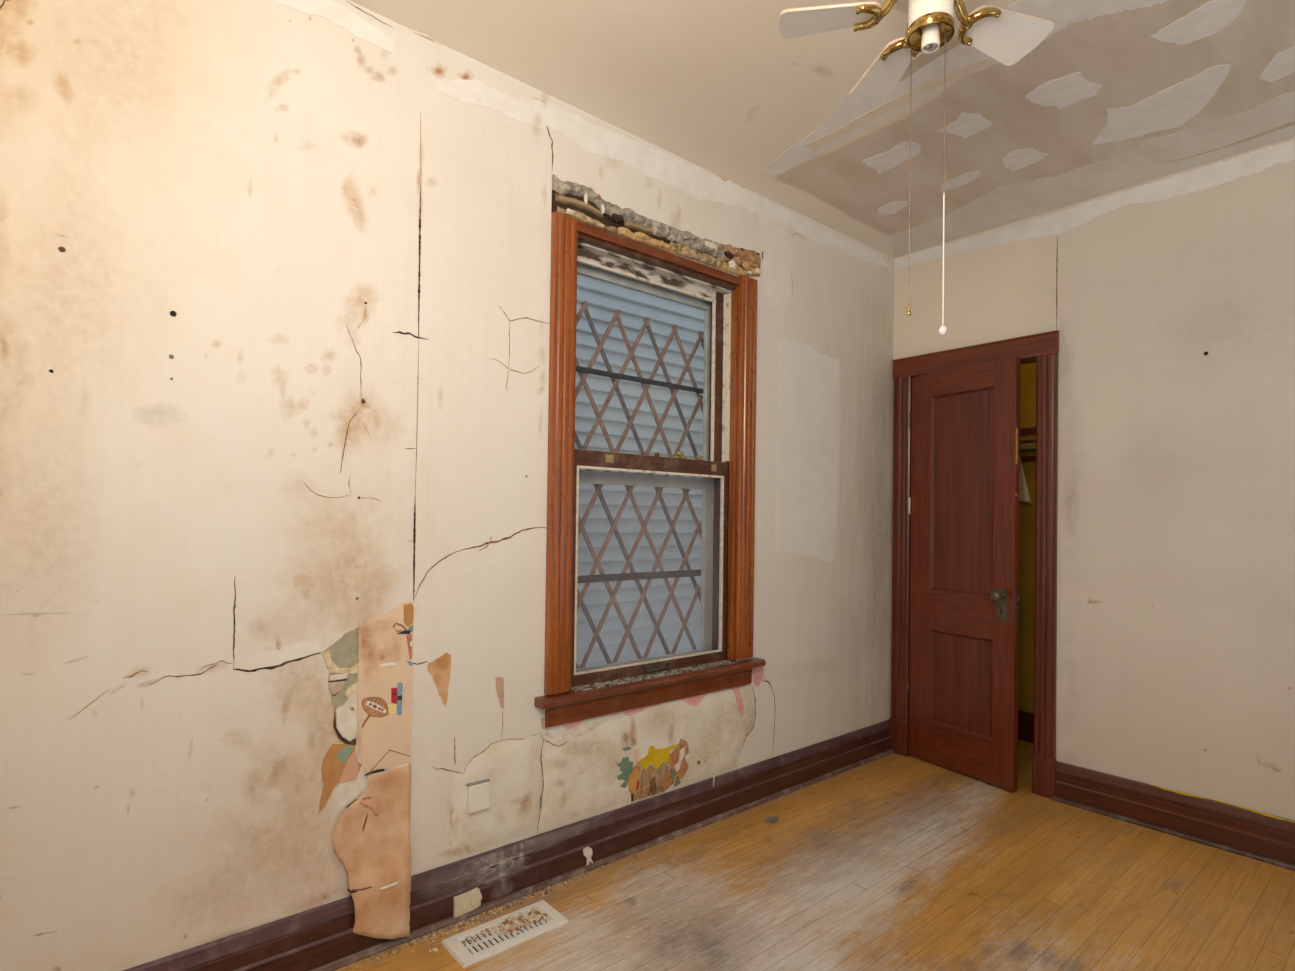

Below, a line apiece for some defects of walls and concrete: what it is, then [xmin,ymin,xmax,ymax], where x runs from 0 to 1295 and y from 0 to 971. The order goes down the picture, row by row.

crack [533,97,554,172]
flaking render [566,193,605,214]
flaking render [705,241,761,275]
crack [393,113,549,600]
crack [304,310,381,502]
crack [68,578,322,720]
peeling [397,603,414,634]
peeling [436,653,448,669]
flaking render [322,627,359,764]
flaking render [546,720,598,742]
flaking render [331,776,367,821]
peeling [616,738,689,802]